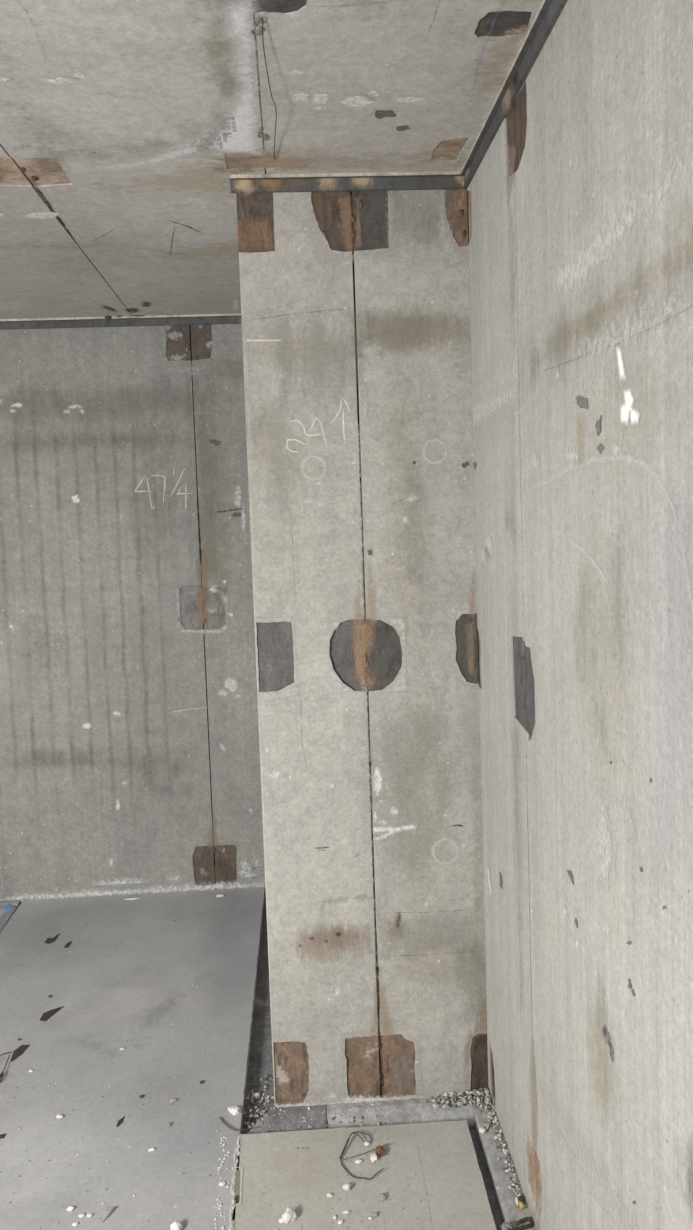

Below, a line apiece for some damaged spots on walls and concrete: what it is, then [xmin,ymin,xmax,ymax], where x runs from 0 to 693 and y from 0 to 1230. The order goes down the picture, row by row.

corrosion [354,619,373,686]
corrosion [300,930,369,955]